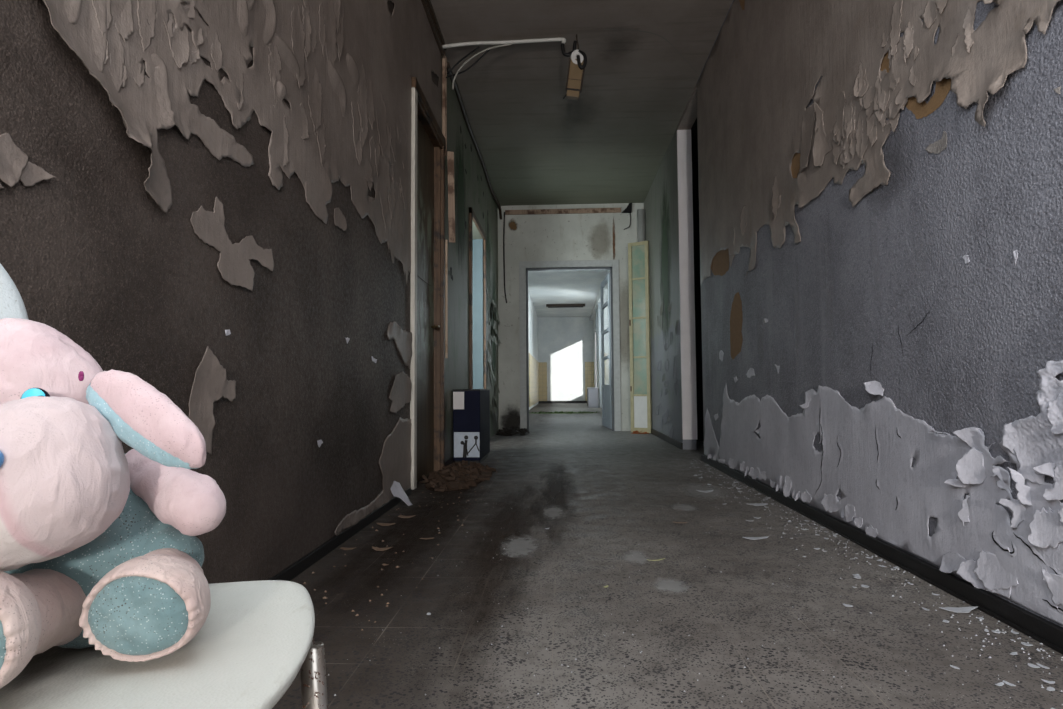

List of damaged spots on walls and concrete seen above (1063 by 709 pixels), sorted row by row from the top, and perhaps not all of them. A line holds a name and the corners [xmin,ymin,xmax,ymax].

peeling [0,133,55,189]
peeling [43,0,442,291]
peeling [697,0,1061,286]
peeling [335,321,413,536]
flaking render [719,292,743,361]
peeling [704,360,1063,625]